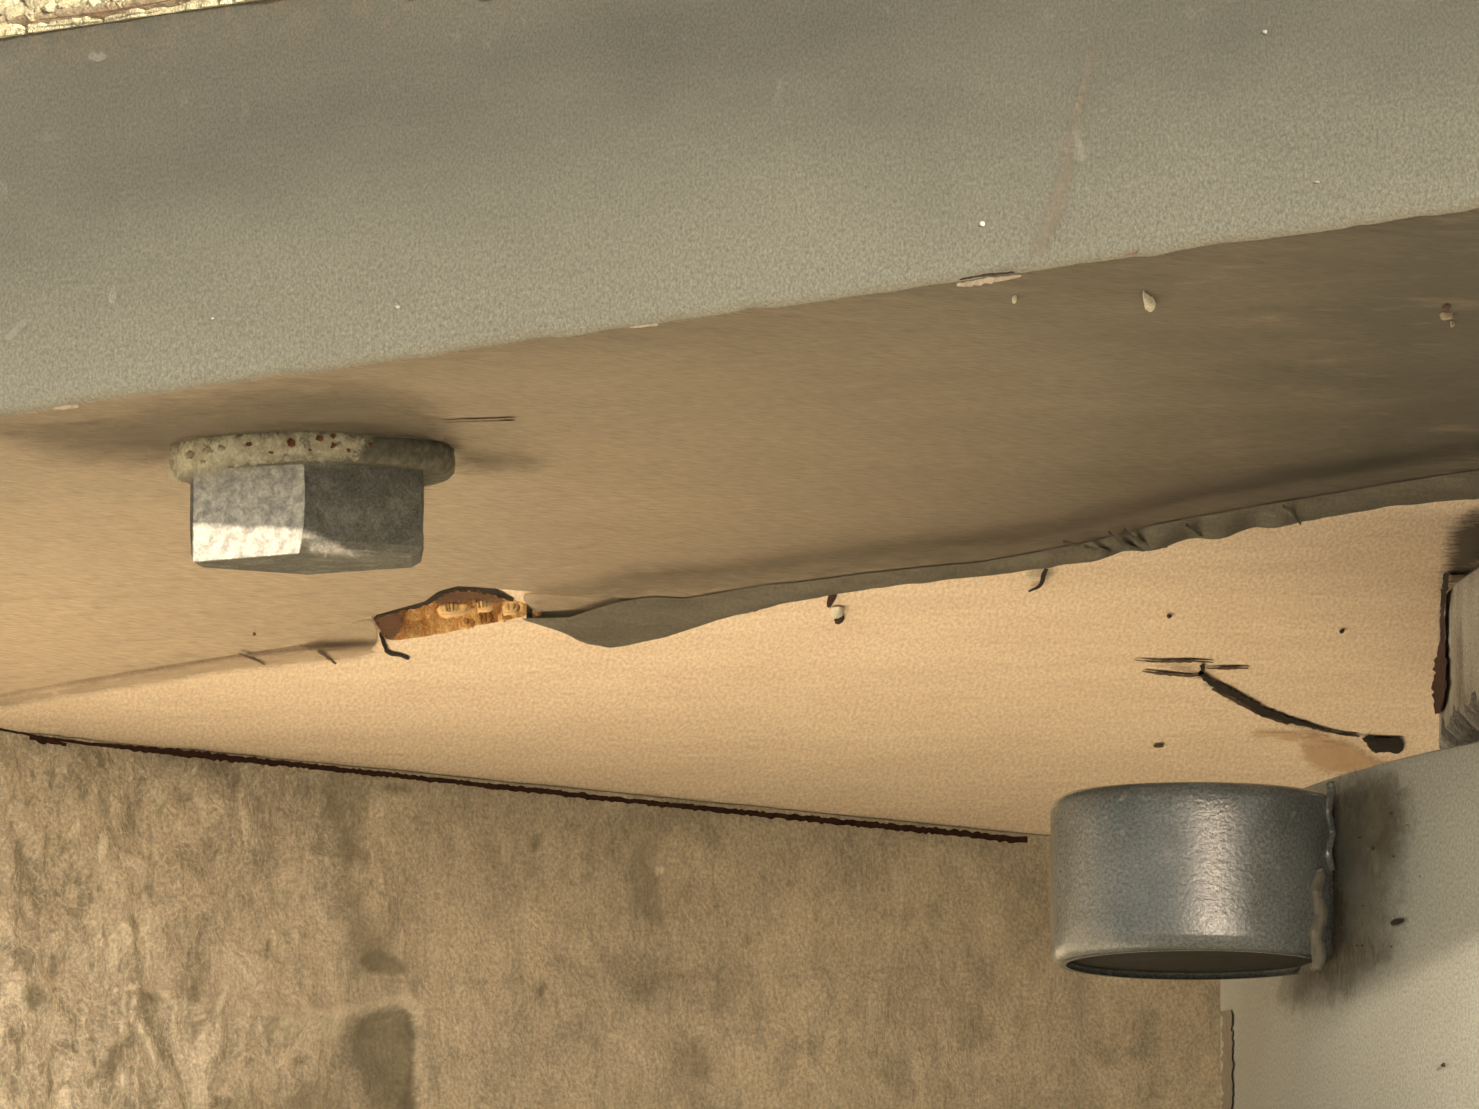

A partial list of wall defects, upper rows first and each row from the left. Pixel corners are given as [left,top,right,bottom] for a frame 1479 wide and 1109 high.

spalling [371,586,542,660]
spalling [827,594,845,625]
crack [1431,573,1450,714]
crack [1136,659,1404,772]